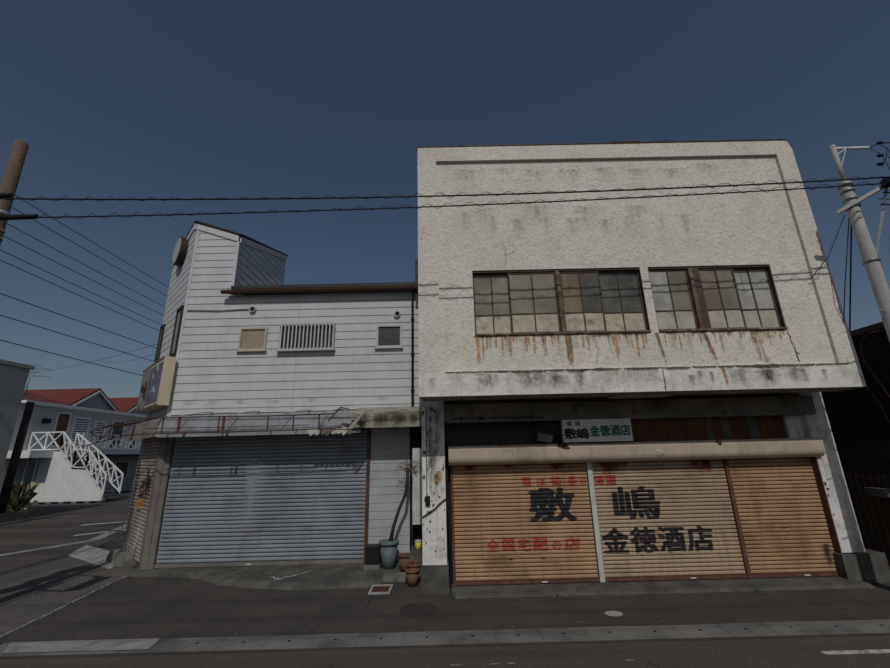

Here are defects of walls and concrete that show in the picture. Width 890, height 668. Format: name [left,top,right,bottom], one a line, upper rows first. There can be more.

corrosion [476,334,589,362]
corrosion [612,329,784,357]